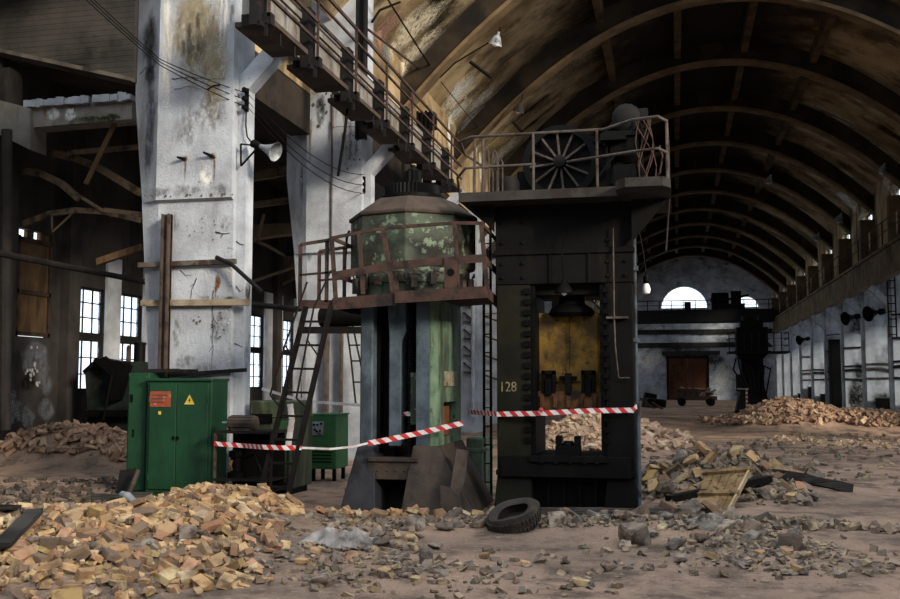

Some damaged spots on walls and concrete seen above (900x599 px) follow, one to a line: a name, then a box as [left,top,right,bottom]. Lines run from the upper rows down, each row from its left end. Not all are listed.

damp [415,0,458,44]
damp [144,0,228,168]
crack [180,270,243,370]